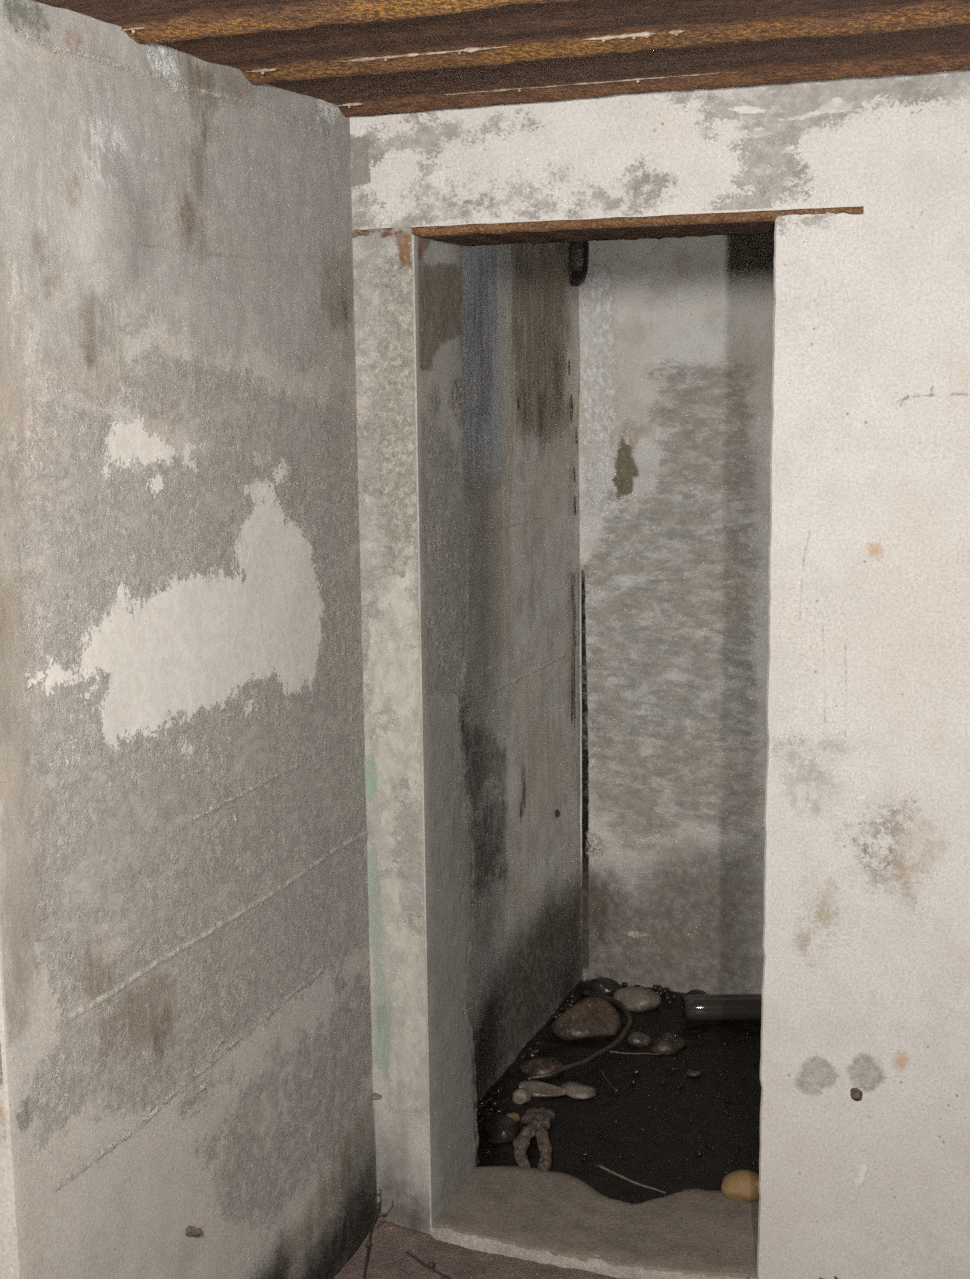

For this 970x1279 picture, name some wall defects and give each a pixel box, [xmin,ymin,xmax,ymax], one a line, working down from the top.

peeling [512,162,676,220]
peeling [0,109,543,1228]
leakage [302,1155,378,1279]